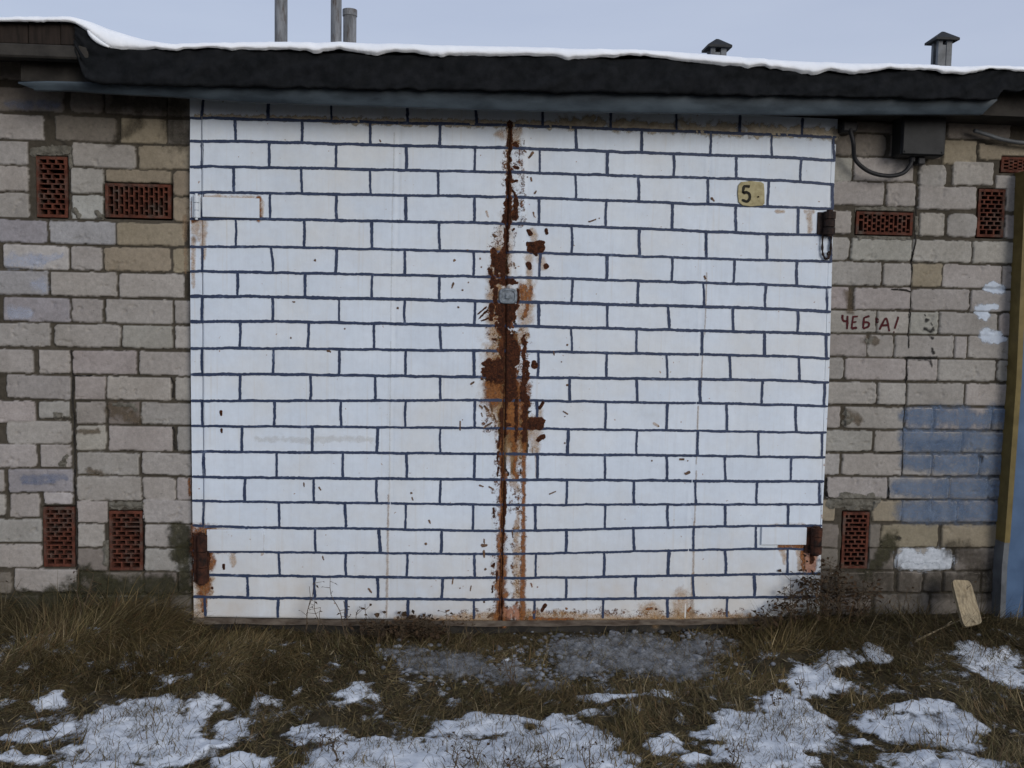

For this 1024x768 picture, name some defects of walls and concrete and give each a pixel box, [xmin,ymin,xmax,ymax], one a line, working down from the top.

corrosion [441,120,751,627]
corrosion [189,523,233,618]
corrosion [778,545,818,573]